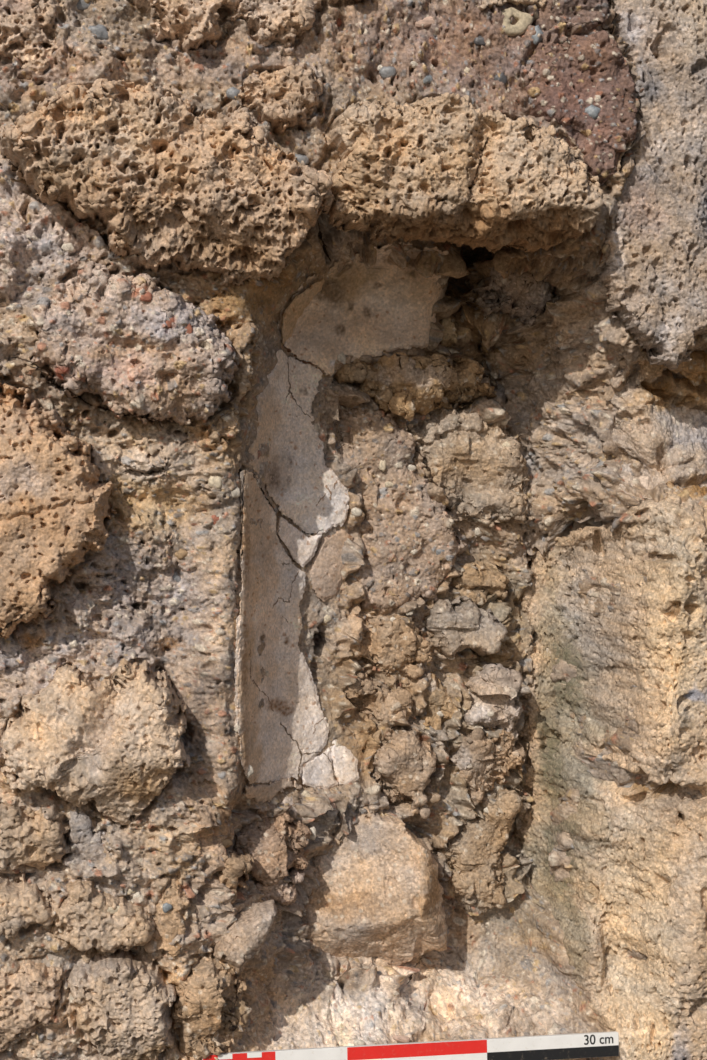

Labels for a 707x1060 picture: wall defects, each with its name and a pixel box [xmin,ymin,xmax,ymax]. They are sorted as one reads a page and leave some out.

crack [284,346,326,418]
crack [234,469,337,625]
peeling [234,242,449,816]
crack [249,649,335,781]